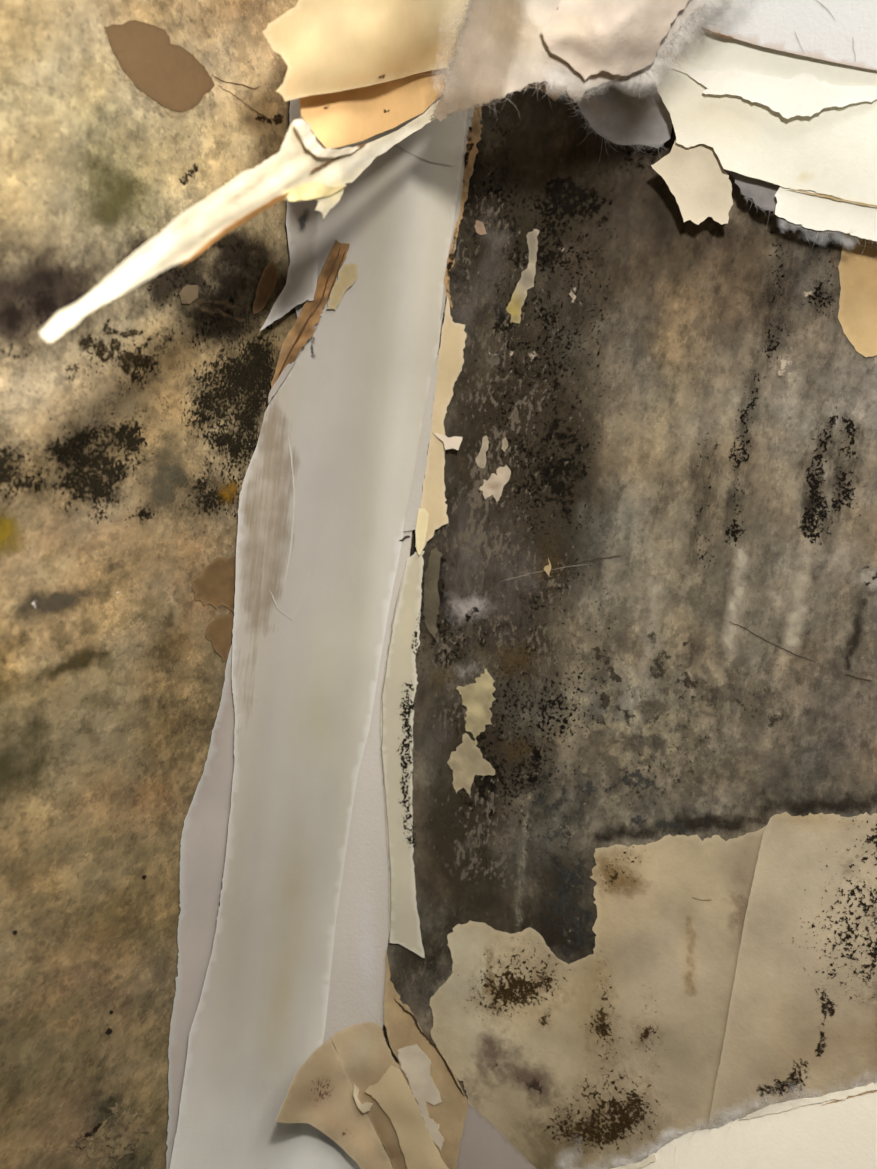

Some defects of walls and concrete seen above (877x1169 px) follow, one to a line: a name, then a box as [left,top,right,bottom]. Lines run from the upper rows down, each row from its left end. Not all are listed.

spalling [104,20,215,117]
peeling [179,284,198,304]
water stain [762,227,838,359]
water stain [0,233,286,547]
water stain [396,87,656,1025]
water stain [691,362,765,650]
water stain [798,406,865,545]
water stain [846,566,877,668]
water stain [671,815,742,834]
water stain [757,797,877,1099]
water stain [483,1038,548,1095]
water stain [542,963,666,1153]